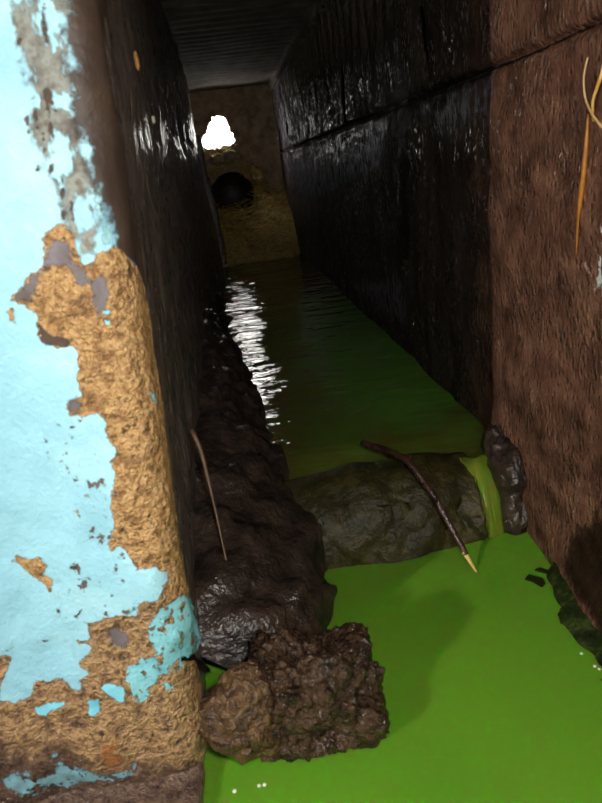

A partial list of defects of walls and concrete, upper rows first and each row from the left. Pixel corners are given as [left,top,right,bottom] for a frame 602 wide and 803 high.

spalling [0,183,210,803]